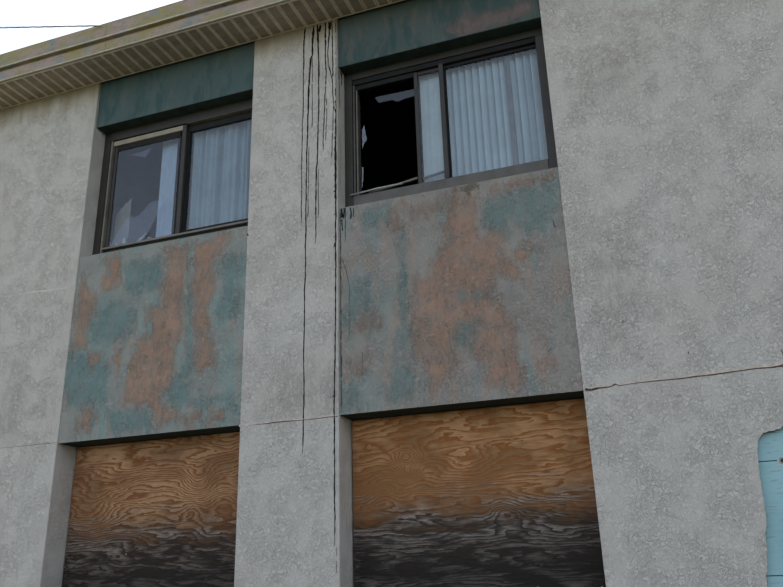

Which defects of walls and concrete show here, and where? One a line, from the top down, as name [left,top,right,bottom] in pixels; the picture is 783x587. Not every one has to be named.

water stain [300,21,354,573]
crack [585,349,783,391]
flaking render [757,426,783,587]